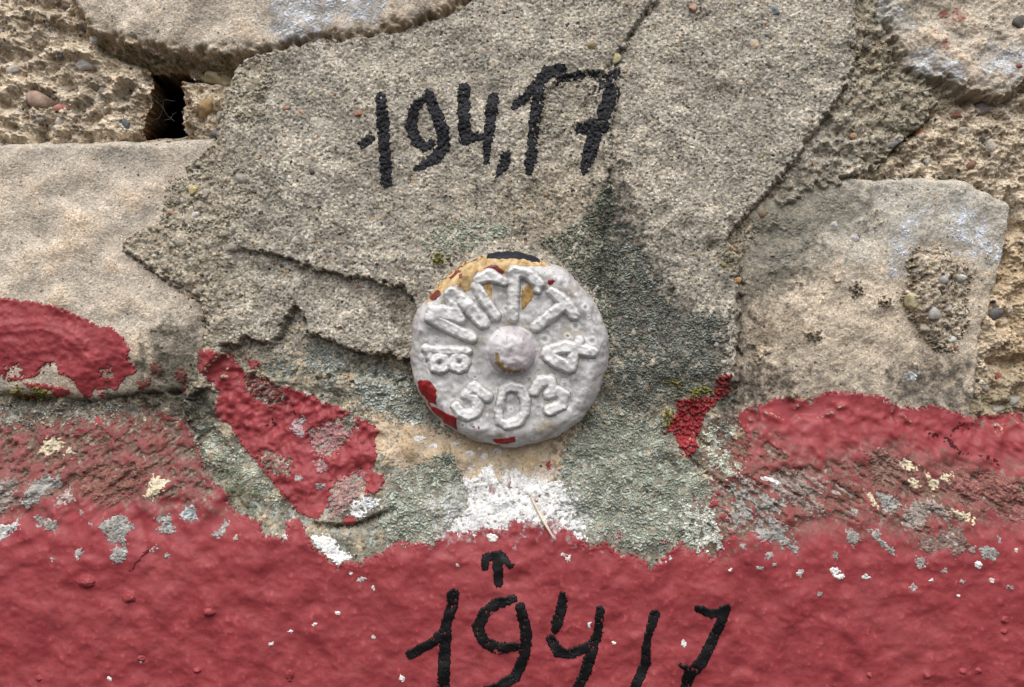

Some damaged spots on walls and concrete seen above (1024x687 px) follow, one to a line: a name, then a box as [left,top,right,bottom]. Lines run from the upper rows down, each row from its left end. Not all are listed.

peeling [0,298,385,526]
peeling [0,461,171,564]
peeling [149,504,198,559]
peeling [211,519,230,539]
peeling [718,443,1024,591]